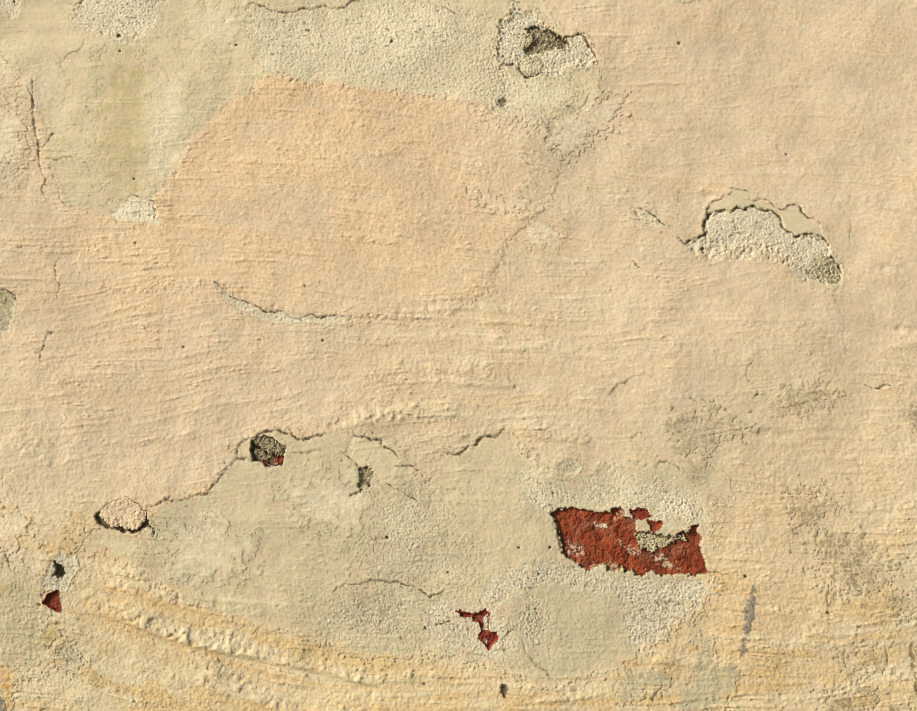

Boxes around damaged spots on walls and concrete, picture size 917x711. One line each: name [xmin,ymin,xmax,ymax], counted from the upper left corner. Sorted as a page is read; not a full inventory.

flaking render [0,0,600,231]
flaking render [676,187,850,292]
crack [203,430,326,495]
crack [362,436,417,500]
peeling [0,422,737,698]